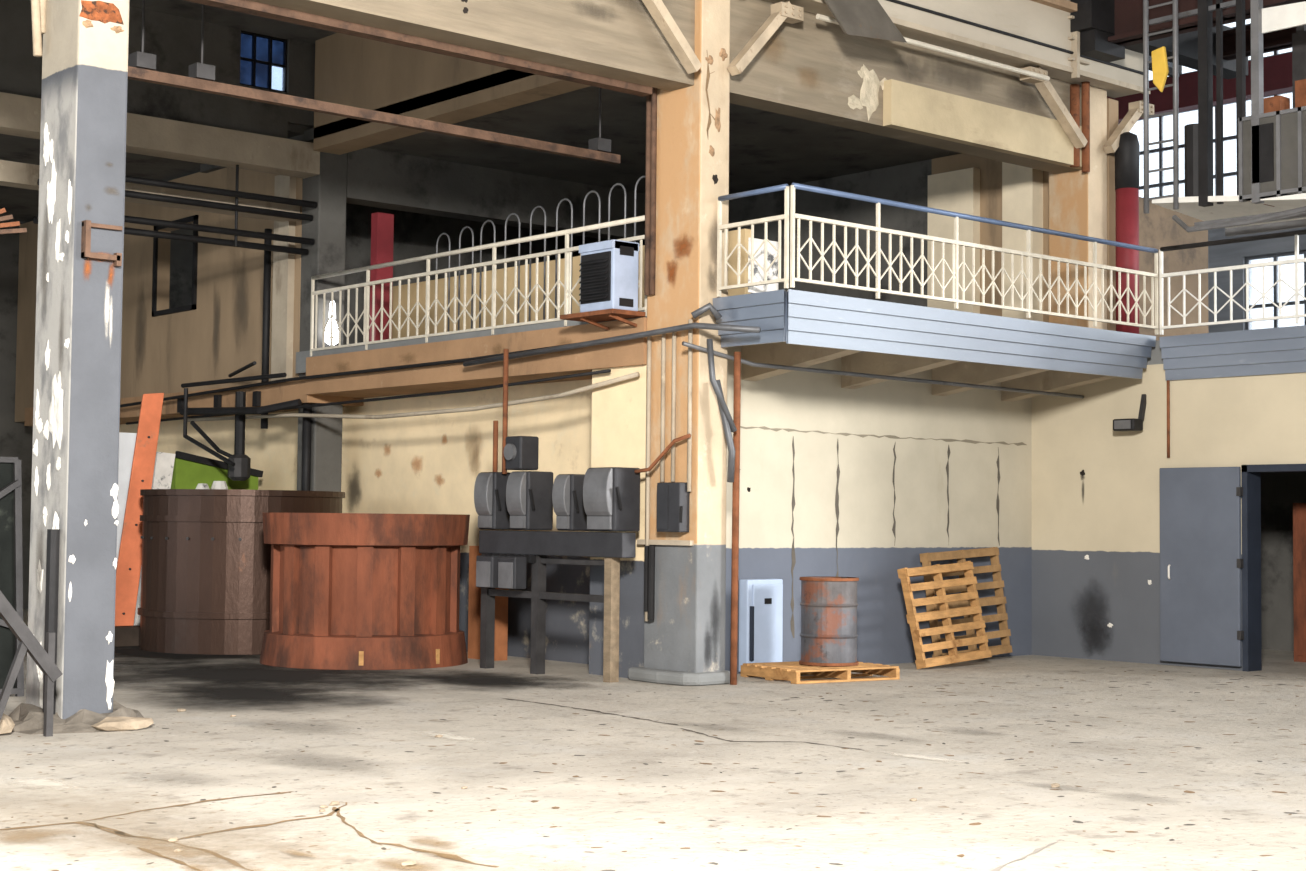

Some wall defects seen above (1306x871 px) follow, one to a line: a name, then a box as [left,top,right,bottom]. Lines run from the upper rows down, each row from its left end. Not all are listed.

spalling [79,0,124,33]
spalling [848,64,887,121]
peeling [43,123,72,282]
peeling [33,338,70,529]